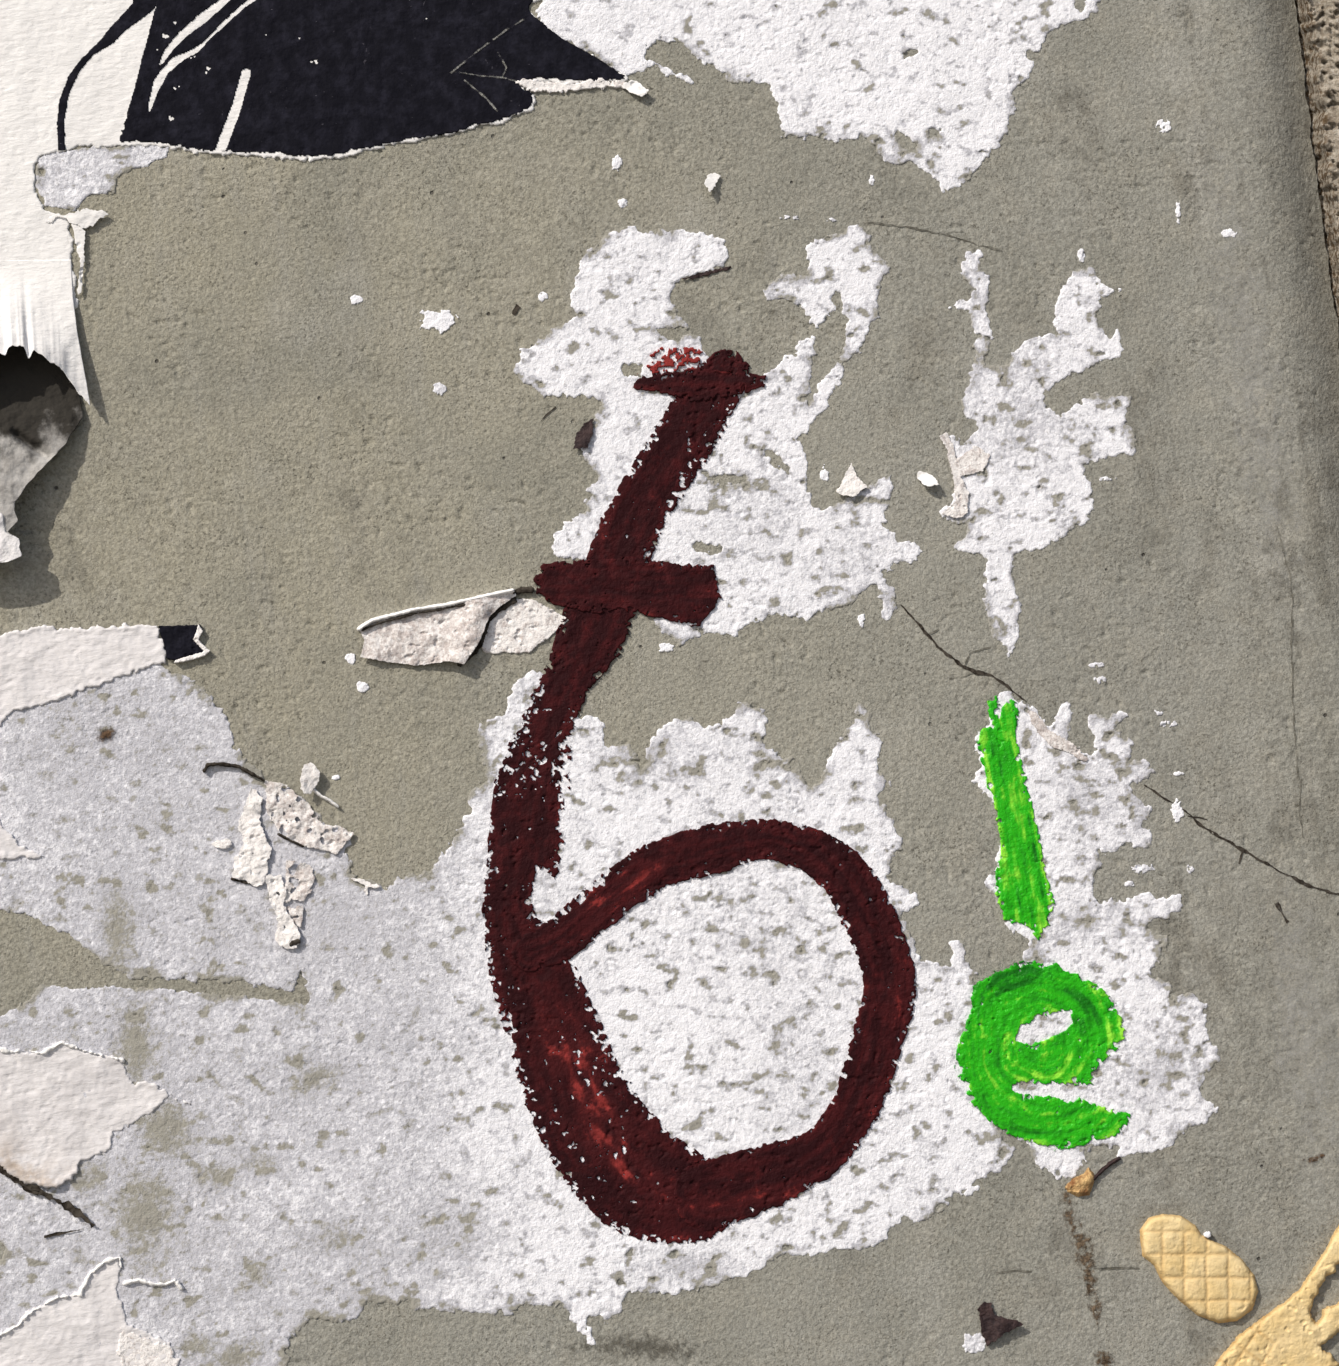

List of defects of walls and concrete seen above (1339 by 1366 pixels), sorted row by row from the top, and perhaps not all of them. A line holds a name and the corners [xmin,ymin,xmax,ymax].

peeling [535,0,1101,193]
peeling [513,225,920,647]
peeling [917,250,1137,658]
peeling [357,586,569,667]
crack [901,605,1027,702]
crack [1277,526,1304,838]
crack [1144,784,1339,924]
peeling [0,664,1221,1366]